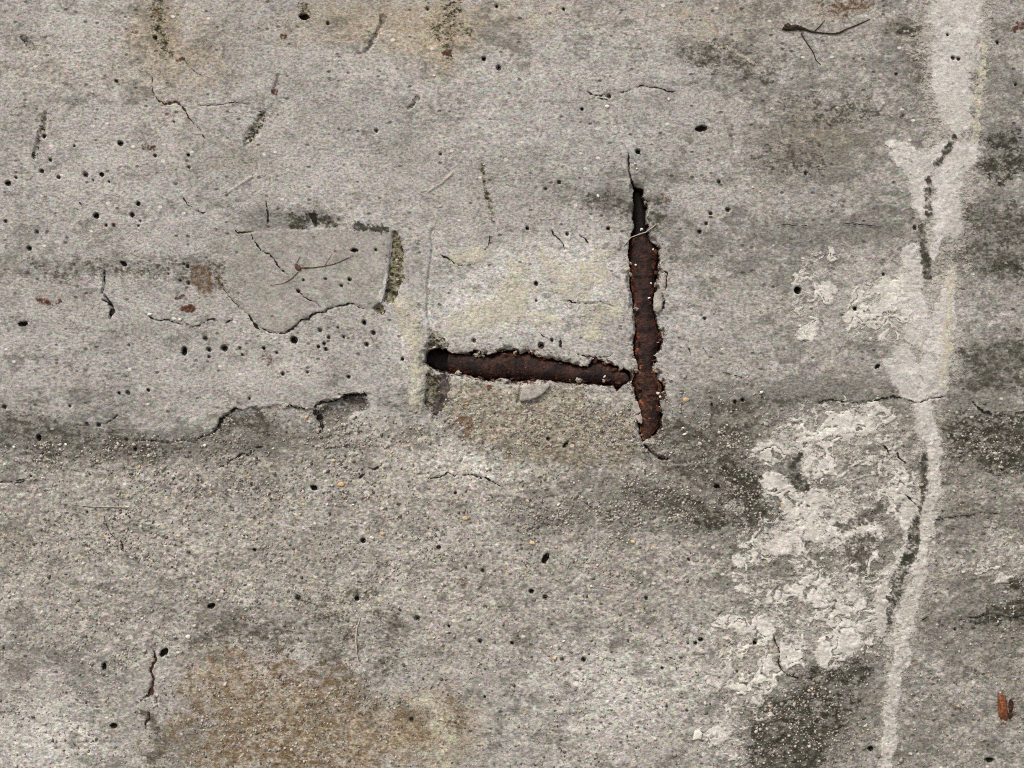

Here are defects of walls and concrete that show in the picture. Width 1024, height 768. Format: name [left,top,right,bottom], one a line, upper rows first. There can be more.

crack [149,203,364,334]
crack [286,391,367,434]
corrosion [457,416,474,437]
corrosion [437,314,635,395]
damp [623,0,1024,768]